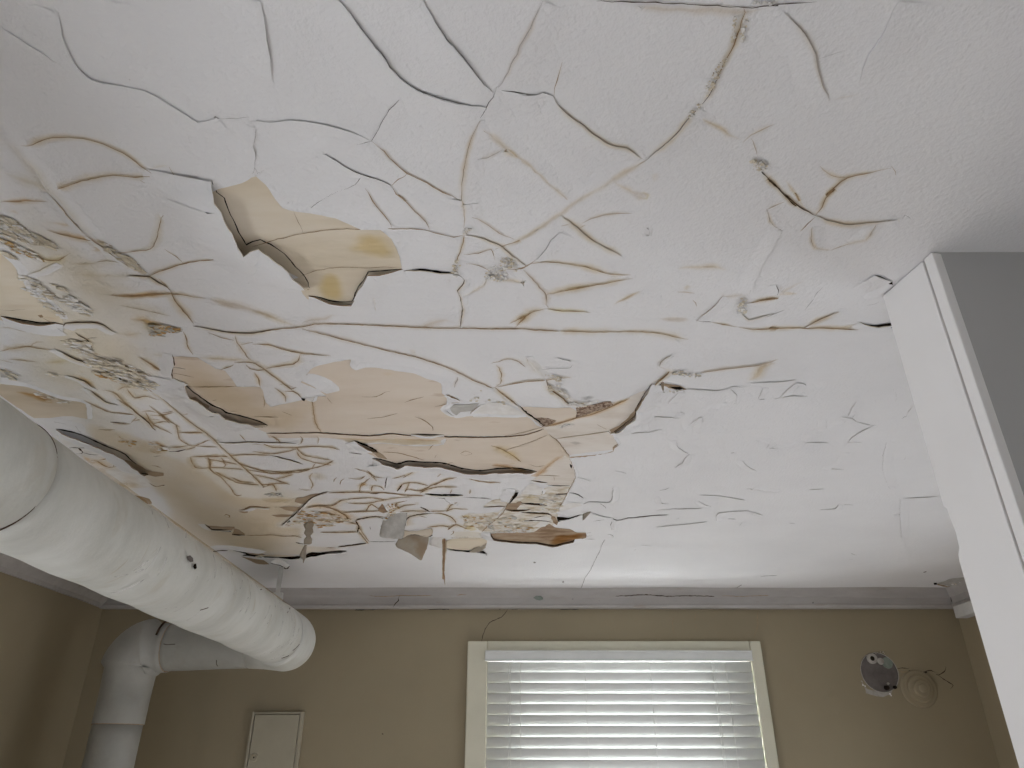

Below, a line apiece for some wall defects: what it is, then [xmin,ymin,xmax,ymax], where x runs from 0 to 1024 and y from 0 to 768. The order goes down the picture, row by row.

peeling [129,166,462,318]
crack [0,0,839,425]
crack [748,125,908,250]
crack [740,287,892,334]
crack [2,343,501,547]
peeling [0,215,775,555]
peeling [197,492,369,569]
crack [356,594,463,610]
crack [561,487,669,610]
crack [620,575,777,597]